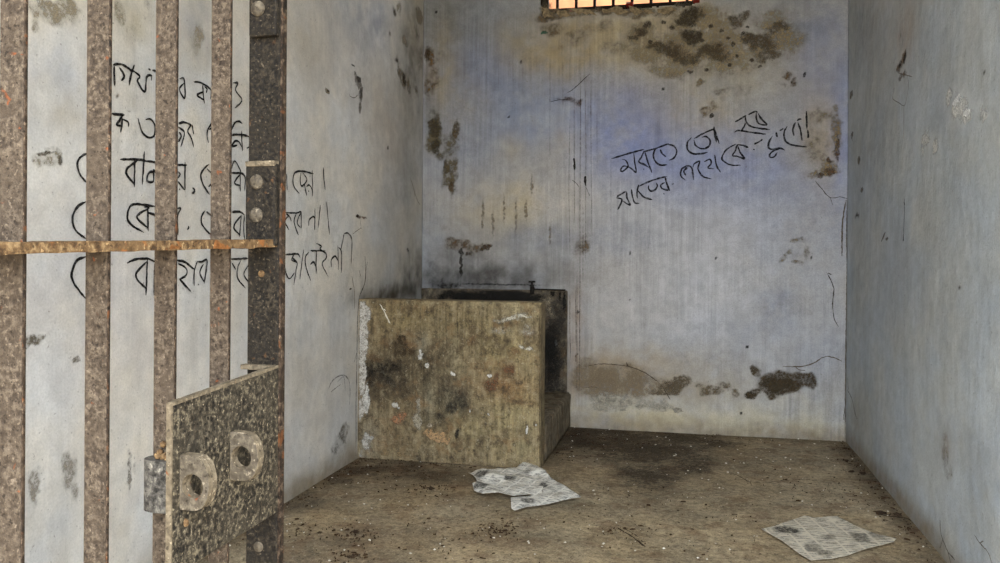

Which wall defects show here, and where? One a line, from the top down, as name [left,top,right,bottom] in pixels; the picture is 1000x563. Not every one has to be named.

leakage [612,6,803,86]
leakage [809,105,841,178]
leakage [366,335,416,397]
leakage [432,281,817,400]